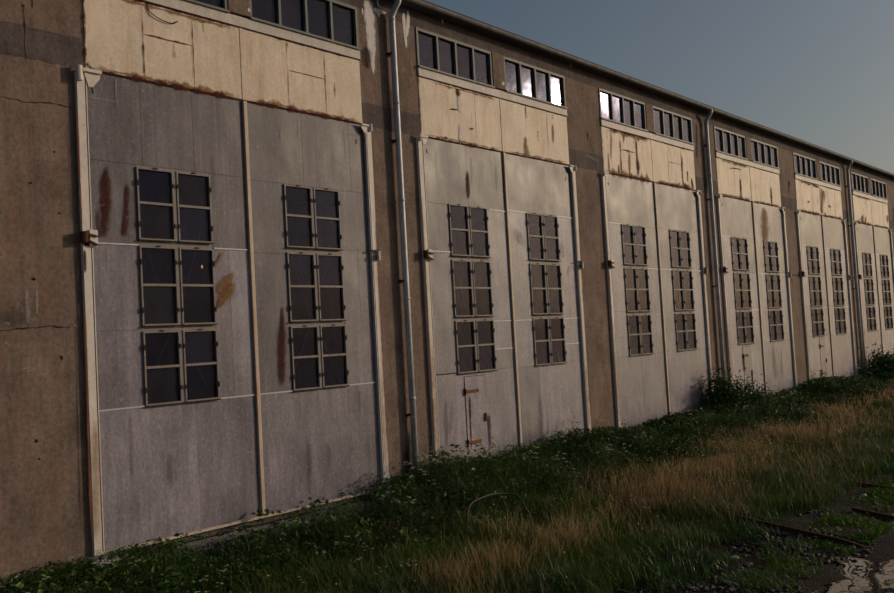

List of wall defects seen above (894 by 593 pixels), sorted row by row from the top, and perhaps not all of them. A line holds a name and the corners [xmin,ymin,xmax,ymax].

corrosion [83,0,232,98]
corrosion [255,35,353,123]
corrosion [601,126,694,190]
corrosion [217,273,235,309]